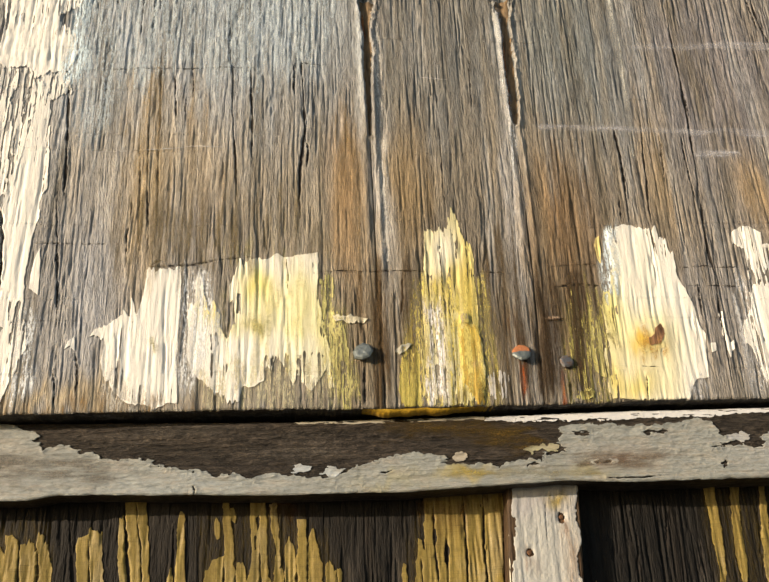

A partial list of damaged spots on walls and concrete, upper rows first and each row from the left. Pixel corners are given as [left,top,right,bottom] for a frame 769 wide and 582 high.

peeling [0,0,83,402]
crack [293,59,324,216]
peeling [0,209,769,582]